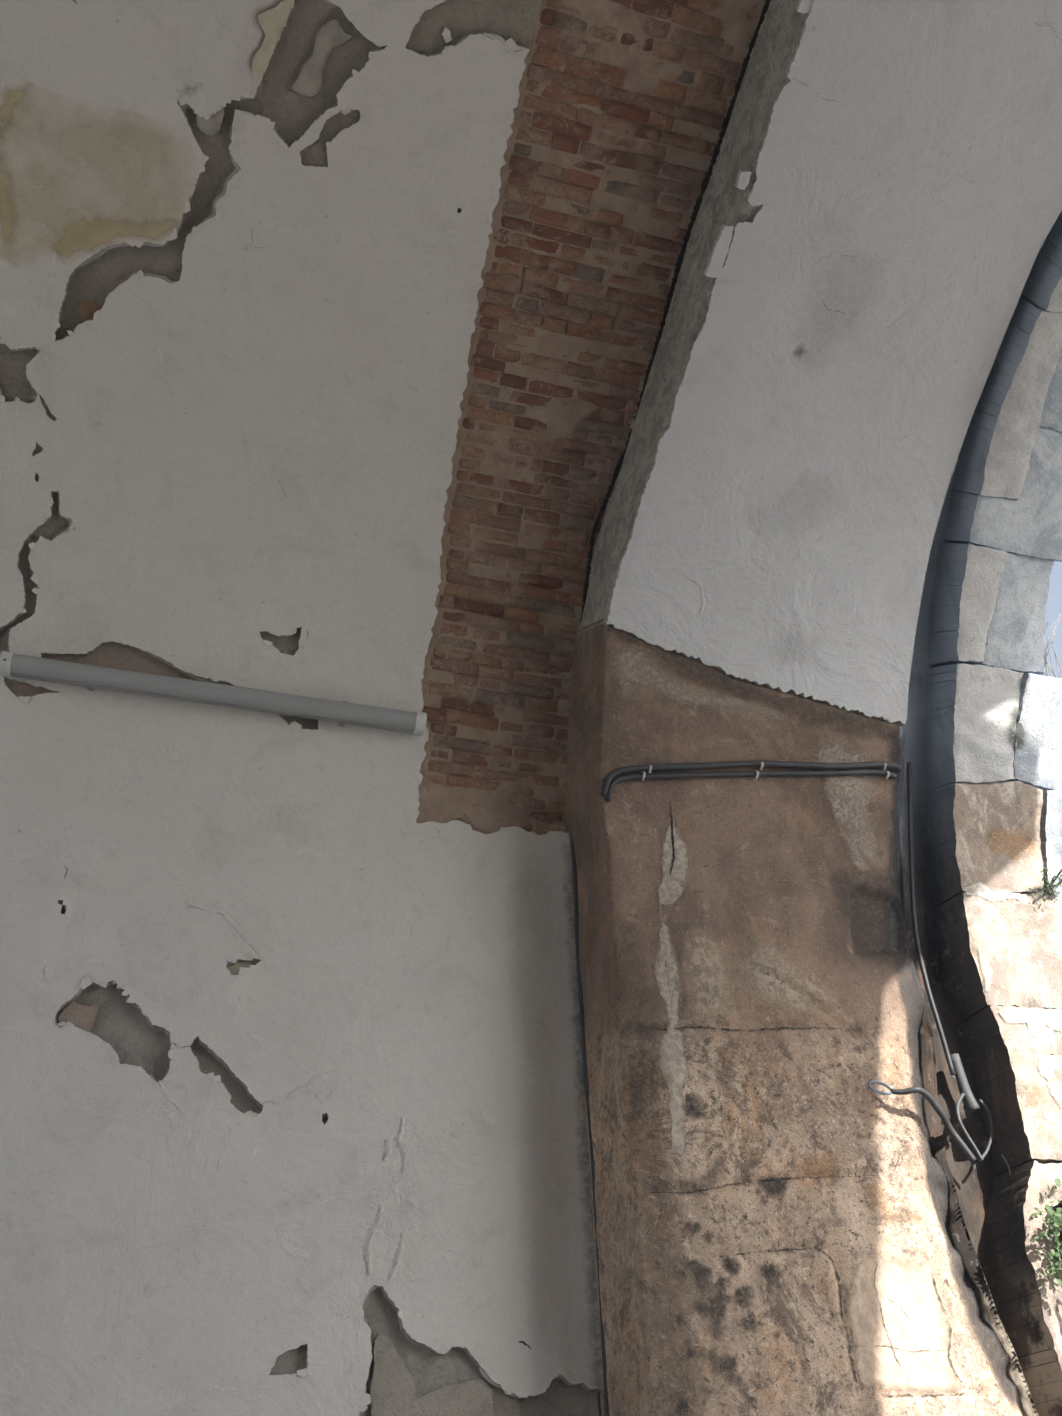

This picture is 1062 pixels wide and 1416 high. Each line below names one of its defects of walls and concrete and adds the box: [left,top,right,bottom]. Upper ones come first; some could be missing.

flaking render [406,0,543,57]
flaking render [0,0,388,421]
flaking render [42,642,232,686]
flaking render [260,628,301,656]
crack [630,971,852,1032]
flaking render [55,978,263,1117]
water stain [627,801,755,1329]
crack [652,1175,875,1194]
water stain [762,1176,789,1193]
flaking render [358,1286,599,1416]
water stain [657,1342,737,1416]
crack [721,1248,965,1397]